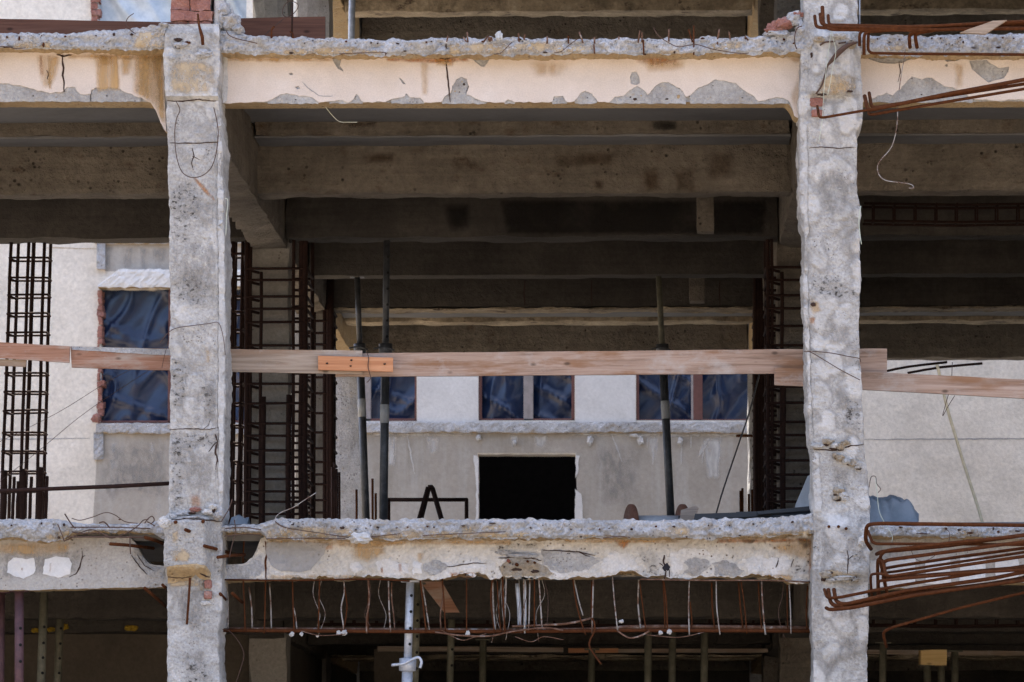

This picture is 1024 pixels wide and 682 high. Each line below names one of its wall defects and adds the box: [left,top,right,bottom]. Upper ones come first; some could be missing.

crack [46,54,71,92]
flaking render [268,73,363,104]
flaking render [391,78,424,104]
flaking render [442,77,487,105]
flaking render [552,72,789,105]
flaking render [945,37,1009,83]
crack [172,142,217,168]
spalling [223,455,860,643]